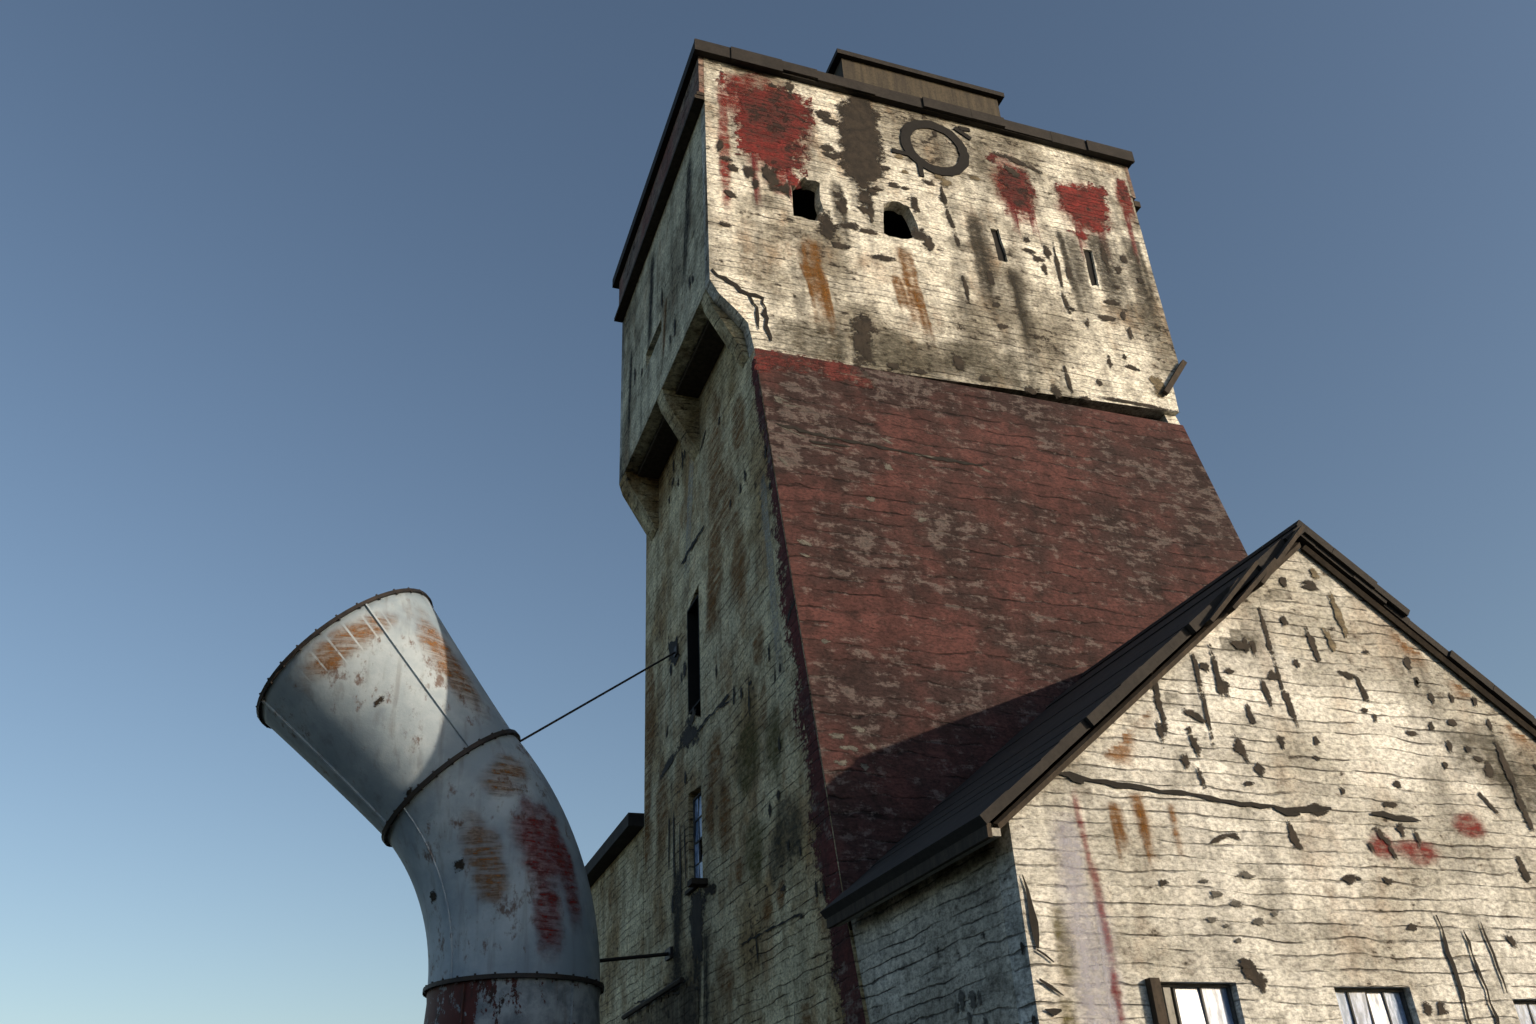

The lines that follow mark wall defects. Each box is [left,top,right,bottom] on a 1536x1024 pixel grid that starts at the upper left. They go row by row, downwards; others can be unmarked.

damp [832,184,849,229]
flaking render [715,68,1180,413]
damp [969,219,1027,335]
damp [995,161,1037,227]
damp [1058,187,1154,303]
peeling [1151,568,1378,788]
rust [467,826,505,899]
rust [487,757,579,945]
rust [706,736,731,845]
peeling [1368,780,1422,860]
peeling [1403,656,1534,832]
spalling [1199,878,1278,993]